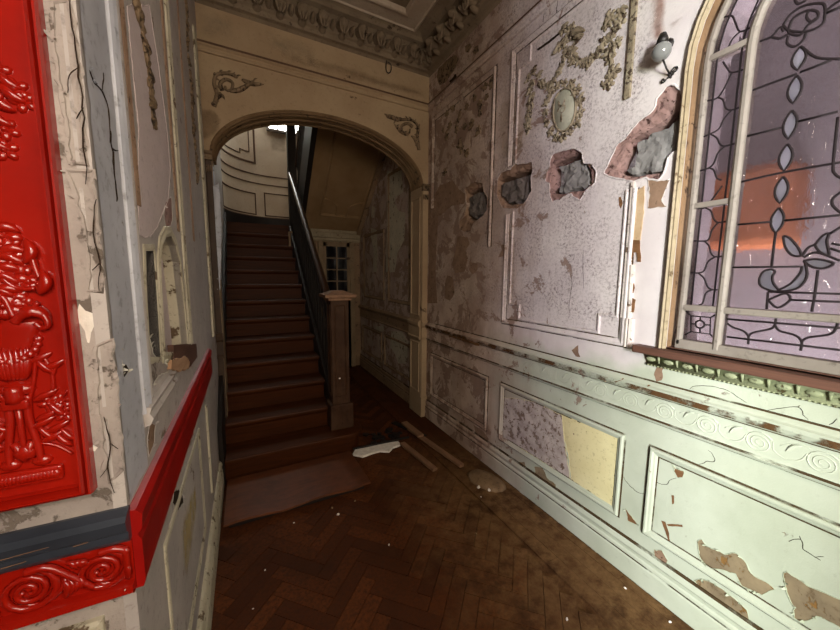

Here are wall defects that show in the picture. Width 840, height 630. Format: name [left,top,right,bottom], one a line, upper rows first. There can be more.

crack [67,0,118,291]
spalling [544,83,682,209]
spalling [427,161,533,304]
spalling [78,304,133,483]
crack [100,418,118,493]
peeling [503,398,577,487]
peeling [647,367,663,387]
peeling [694,539,840,627]